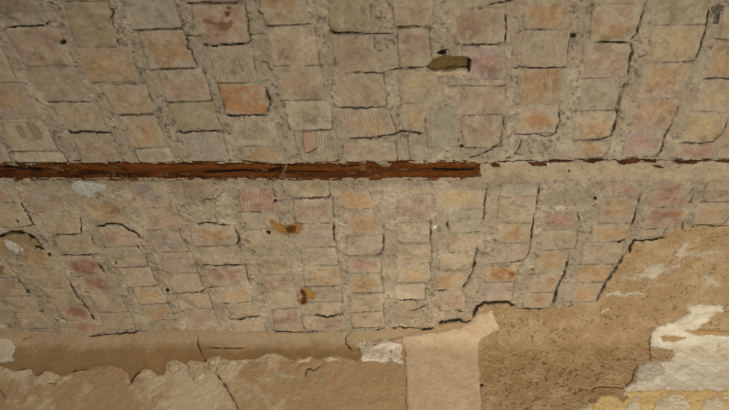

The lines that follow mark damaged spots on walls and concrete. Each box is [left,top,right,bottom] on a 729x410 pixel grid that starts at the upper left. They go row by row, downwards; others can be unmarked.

spalling [436,67,467,77]
crack [471,3,729,172]
corrosion [2,163,374,182]
corrosion [394,162,478,181]
corrosion [270,220,302,234]
crack [57,218,141,272]
crack [597,198,664,299]
corrosion [300,287,316,304]
crack [377,261,568,331]
peeling [661,306,729,361]
peeling [636,363,664,381]
peeling [592,389,729,410]